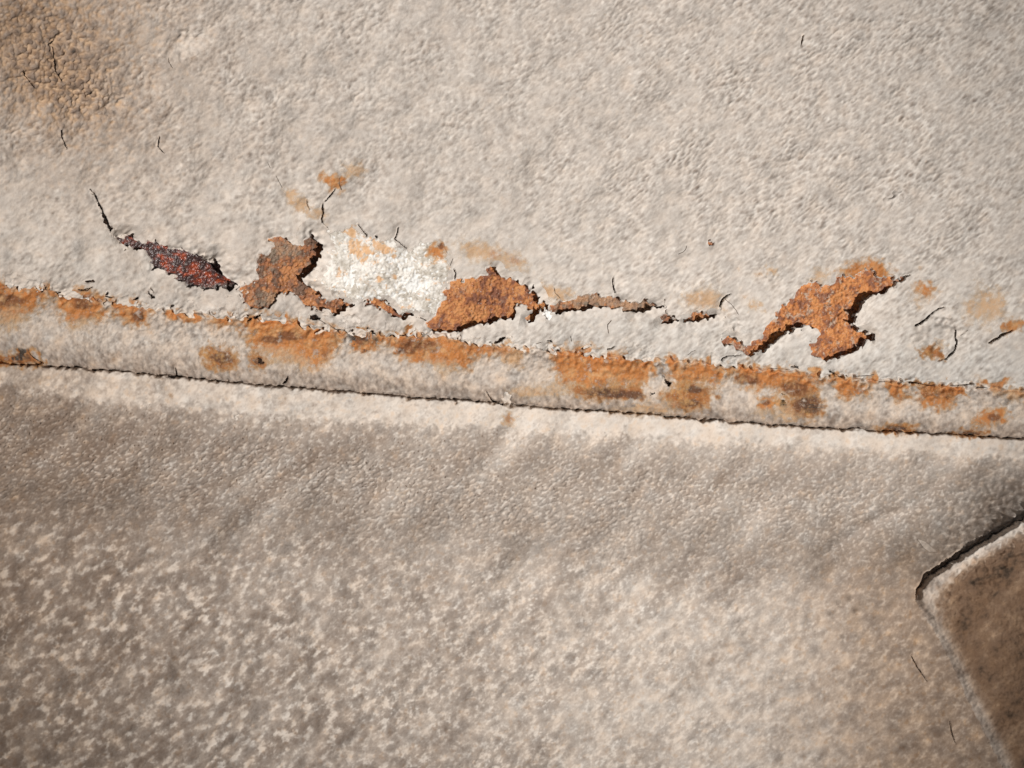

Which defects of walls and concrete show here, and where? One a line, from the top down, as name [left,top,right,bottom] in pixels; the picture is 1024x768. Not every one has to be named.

rust [840,257,893,277]
peeling [5,271,89,300]
peeling [111,220,904,370]
crack [829,370,987,388]